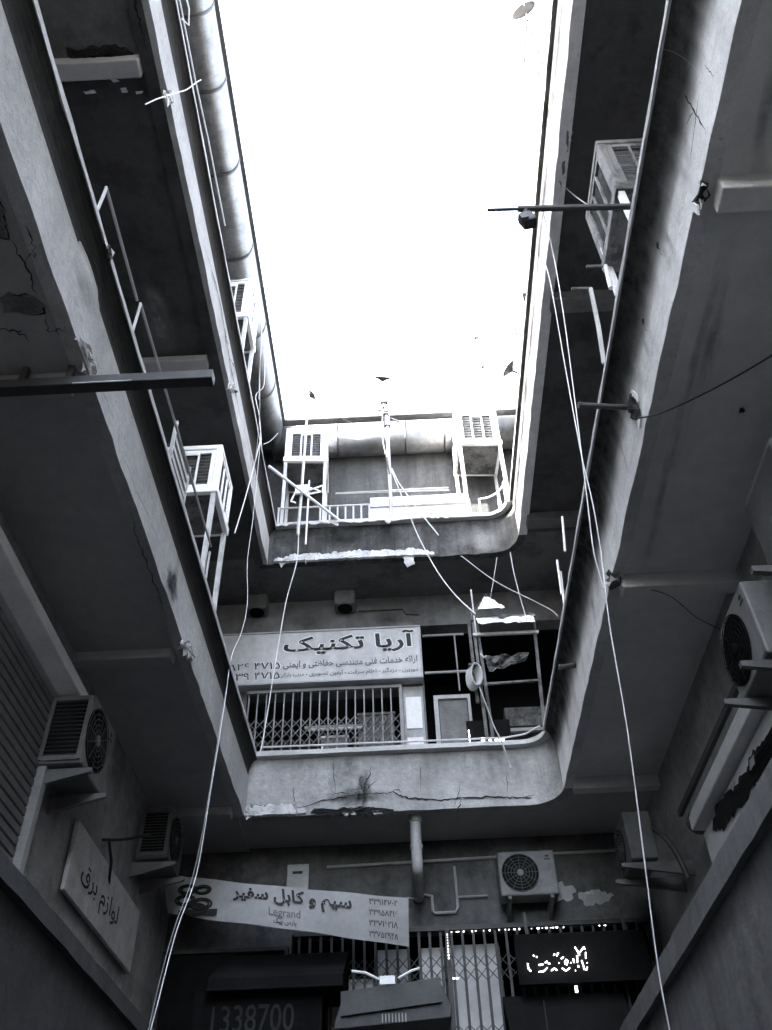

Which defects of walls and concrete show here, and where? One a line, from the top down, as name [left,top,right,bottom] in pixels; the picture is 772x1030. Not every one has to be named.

peeling [0,292,47,316]
crack [256,762,532,813]